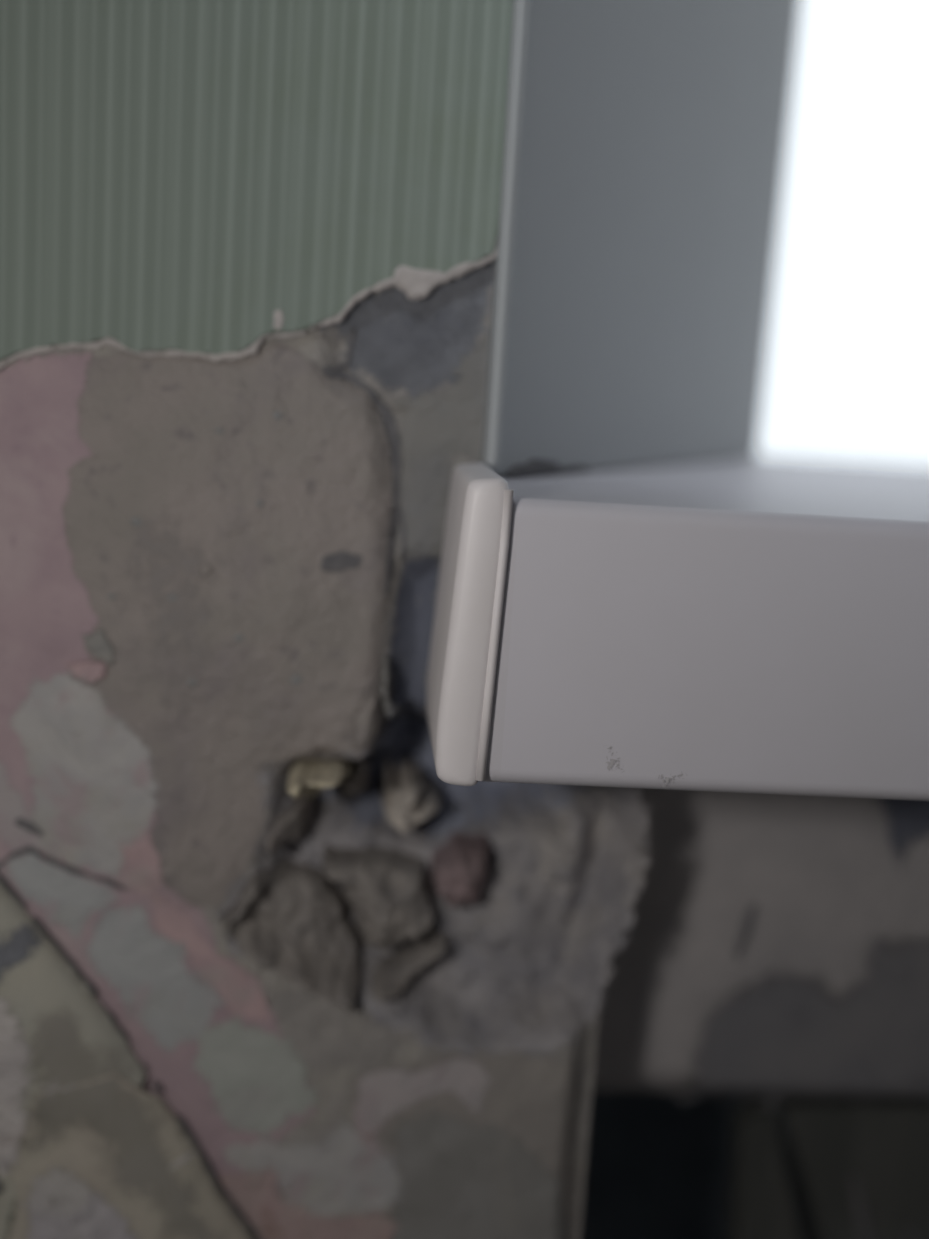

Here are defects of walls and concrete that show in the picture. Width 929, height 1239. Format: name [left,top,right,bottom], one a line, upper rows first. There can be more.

spalling [0,695,653,1239]